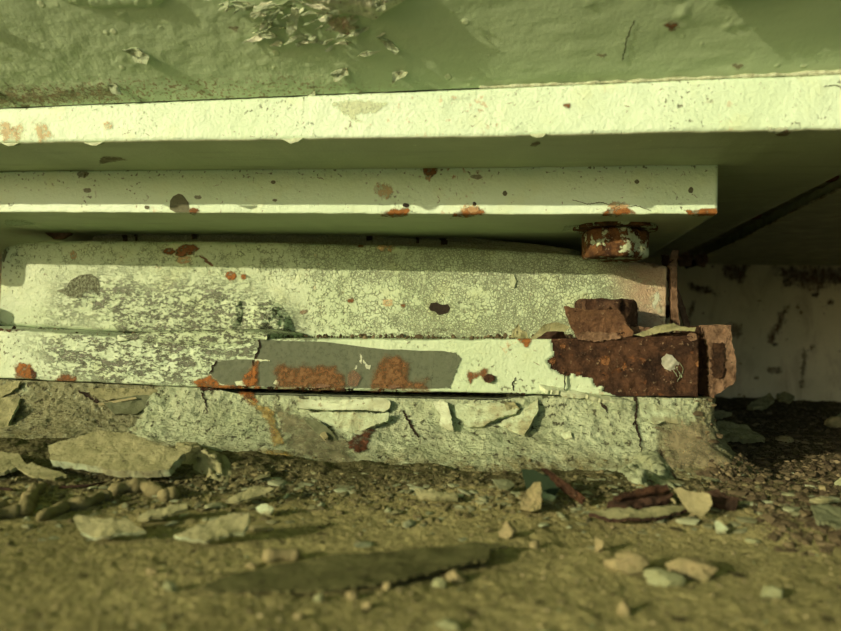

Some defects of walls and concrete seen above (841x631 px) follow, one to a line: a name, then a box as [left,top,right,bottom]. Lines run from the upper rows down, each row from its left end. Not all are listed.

corrosion [163,244,199,264]
peeling [57,274,100,298]
corrosion [564,306,633,337]
corrosion [274,364,360,391]
peeling [209,339,462,389]
corrosion [371,356,428,393]
corrosion [709,342,726,379]
flaking render [0,381,21,429]
flaking render [433,384,616,436]
crack [632,396,676,478]
flaking render [0,398,526,544]
flaking render [538,396,841,536]